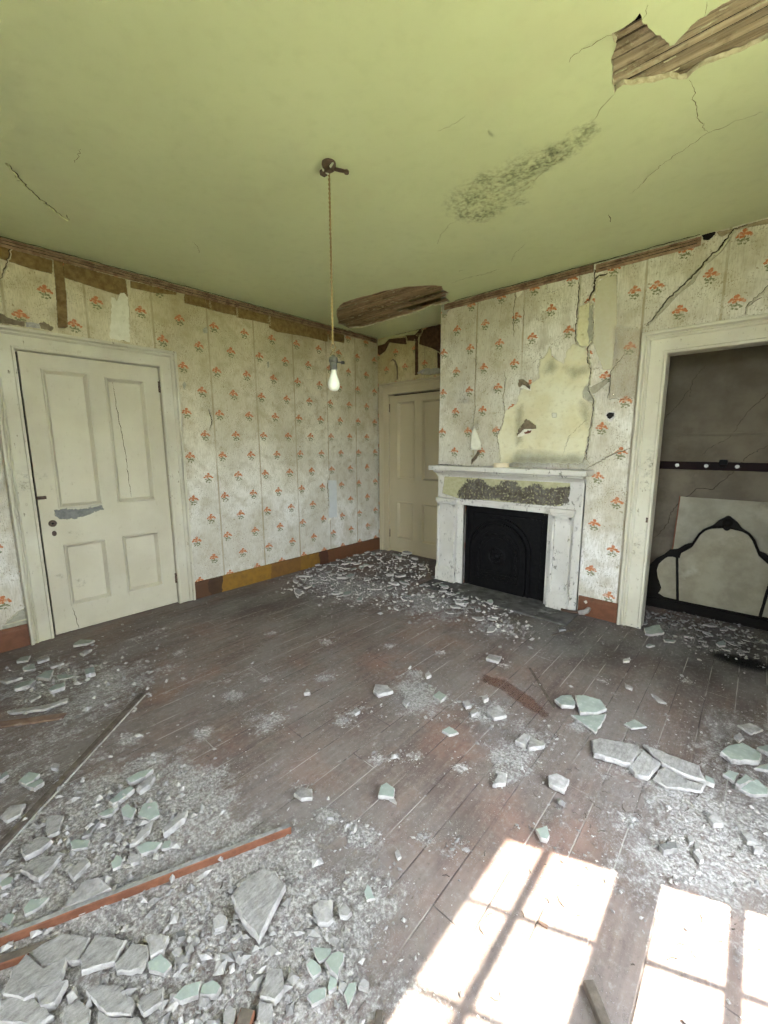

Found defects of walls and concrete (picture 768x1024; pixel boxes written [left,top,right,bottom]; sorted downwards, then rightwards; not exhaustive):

crack [633,80,758,192]
crack [5,163,68,221]
peeling [0,246,344,343]
flaking render [576,302,594,347]
crack [455,224,748,468]
peeling [442,476,570,506]